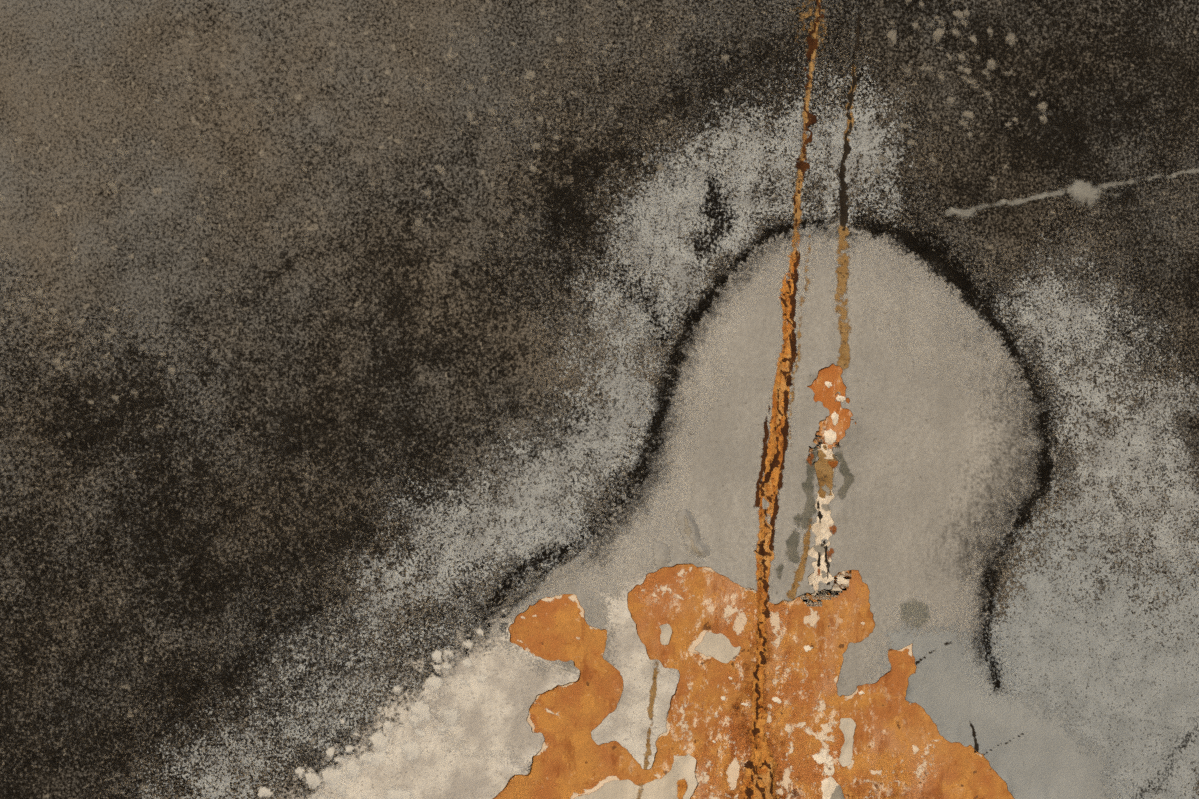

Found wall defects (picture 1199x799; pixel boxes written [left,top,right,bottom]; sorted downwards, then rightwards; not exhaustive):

damp [591,562,680,769]
peeling [493,364,1014,799]
corrosion [728,0,826,799]
corrosion [835,225,851,369]